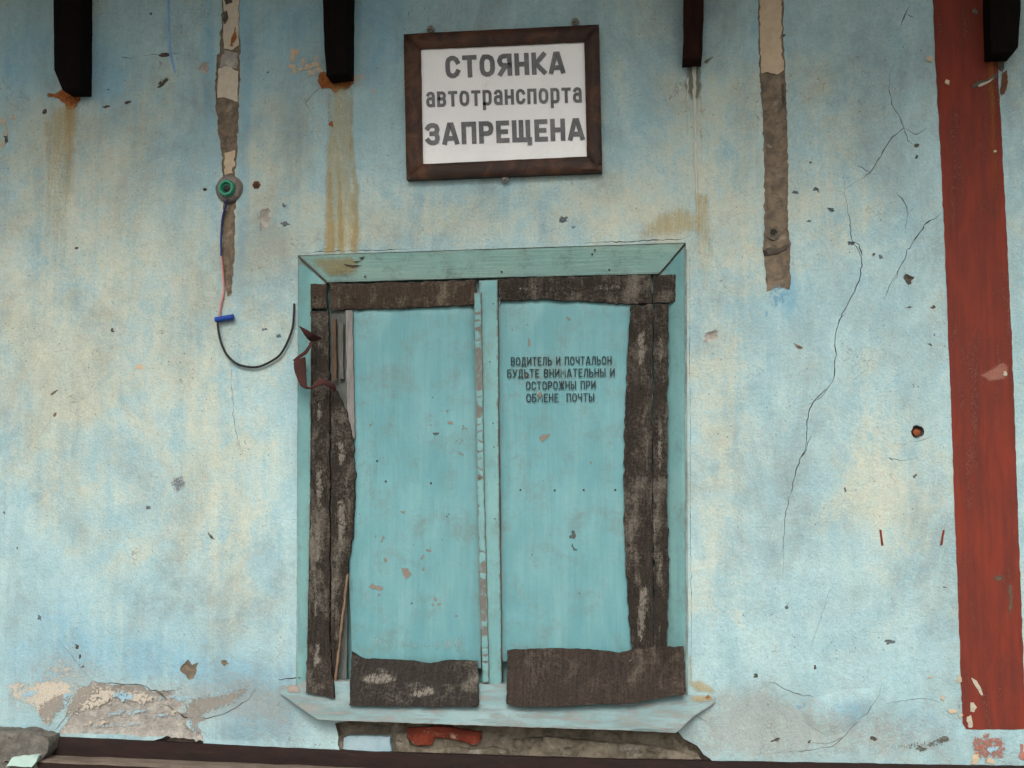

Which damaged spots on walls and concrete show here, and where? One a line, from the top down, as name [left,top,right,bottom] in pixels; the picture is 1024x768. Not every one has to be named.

rust [47,90,80,110]
spalling [197,0,241,177]
peeling [288,48,324,76]
rust [318,72,354,108]
spalling [758,0,799,292]
spalling [222,201,236,297]
crack [885,192,943,297]
crack [783,66,924,565]
peeling [8,644,246,742]